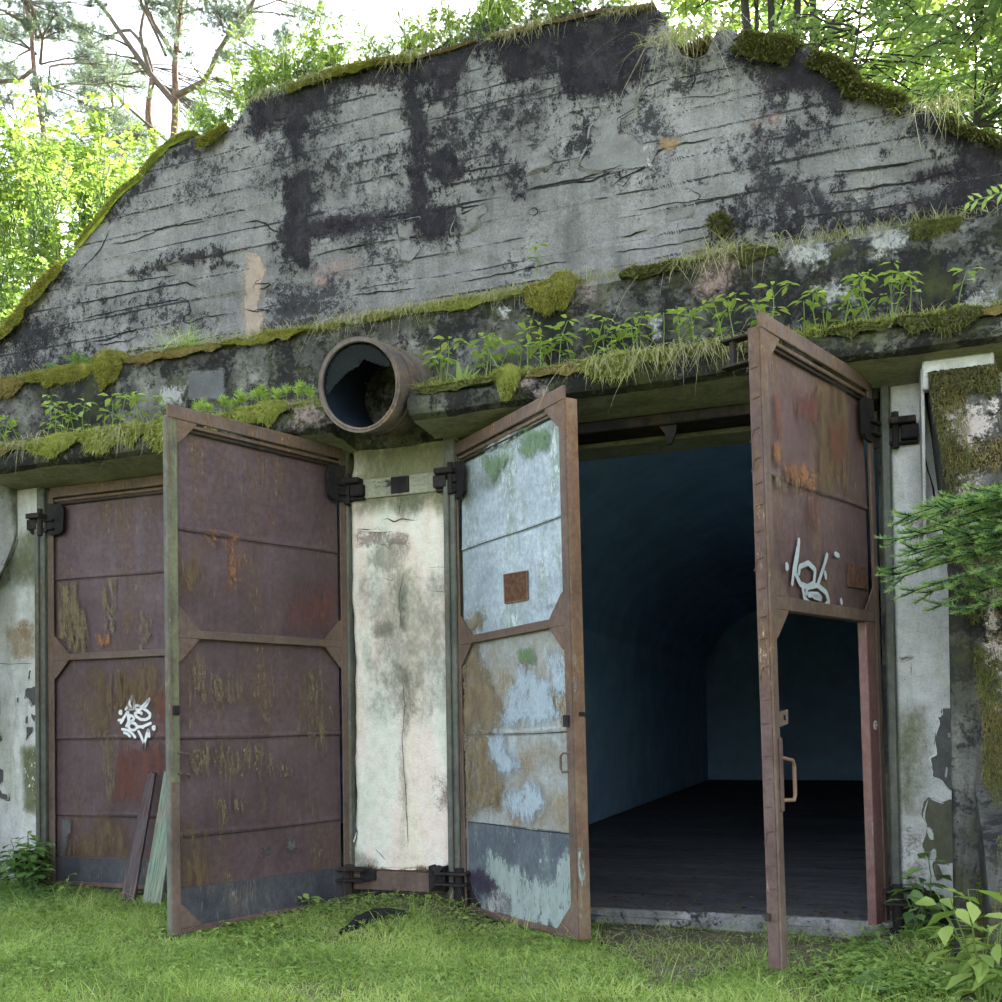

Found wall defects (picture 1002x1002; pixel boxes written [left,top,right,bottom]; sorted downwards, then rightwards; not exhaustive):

water stain [234,0,684,312]
crack [525,137,713,215]
crack [617,188,733,252]
crack [794,162,944,219]
crack [80,221,271,345]
water stain [360,440,444,480]
water stain [0,488,35,585]
corrosion [58,577,117,653]
corrosion [116,663,166,736]
corrosion [462,611,508,826]
flaking render [0,769,10,801]
flaking render [922,707,953,881]